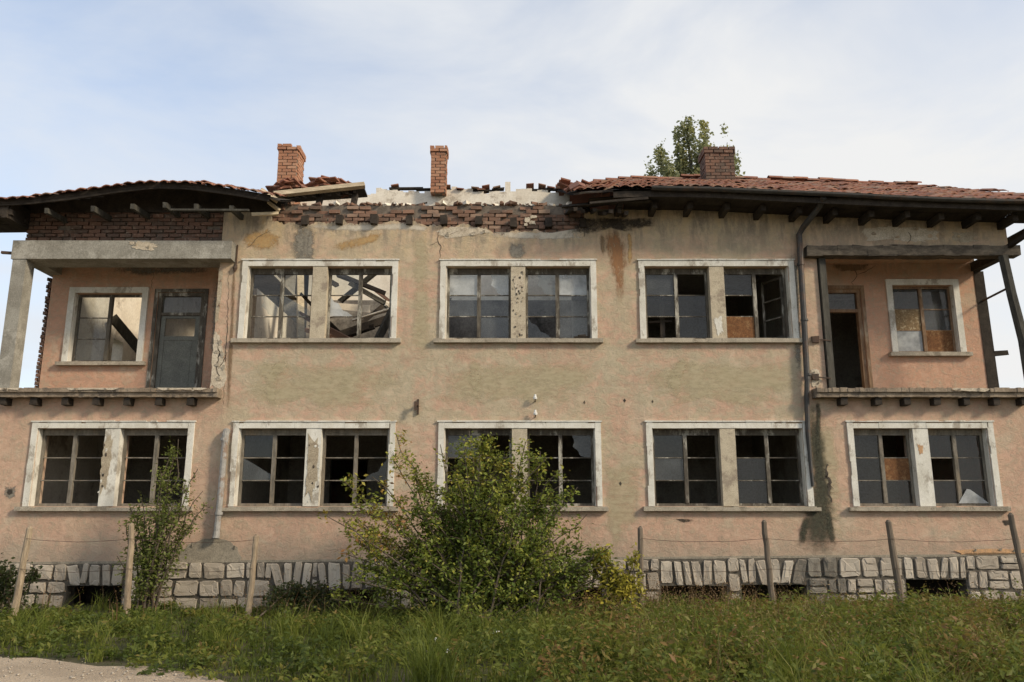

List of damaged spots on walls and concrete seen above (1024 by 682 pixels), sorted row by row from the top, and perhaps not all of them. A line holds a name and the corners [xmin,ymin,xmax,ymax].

leakage [800,518,808,542]
leakage [816,404,840,541]